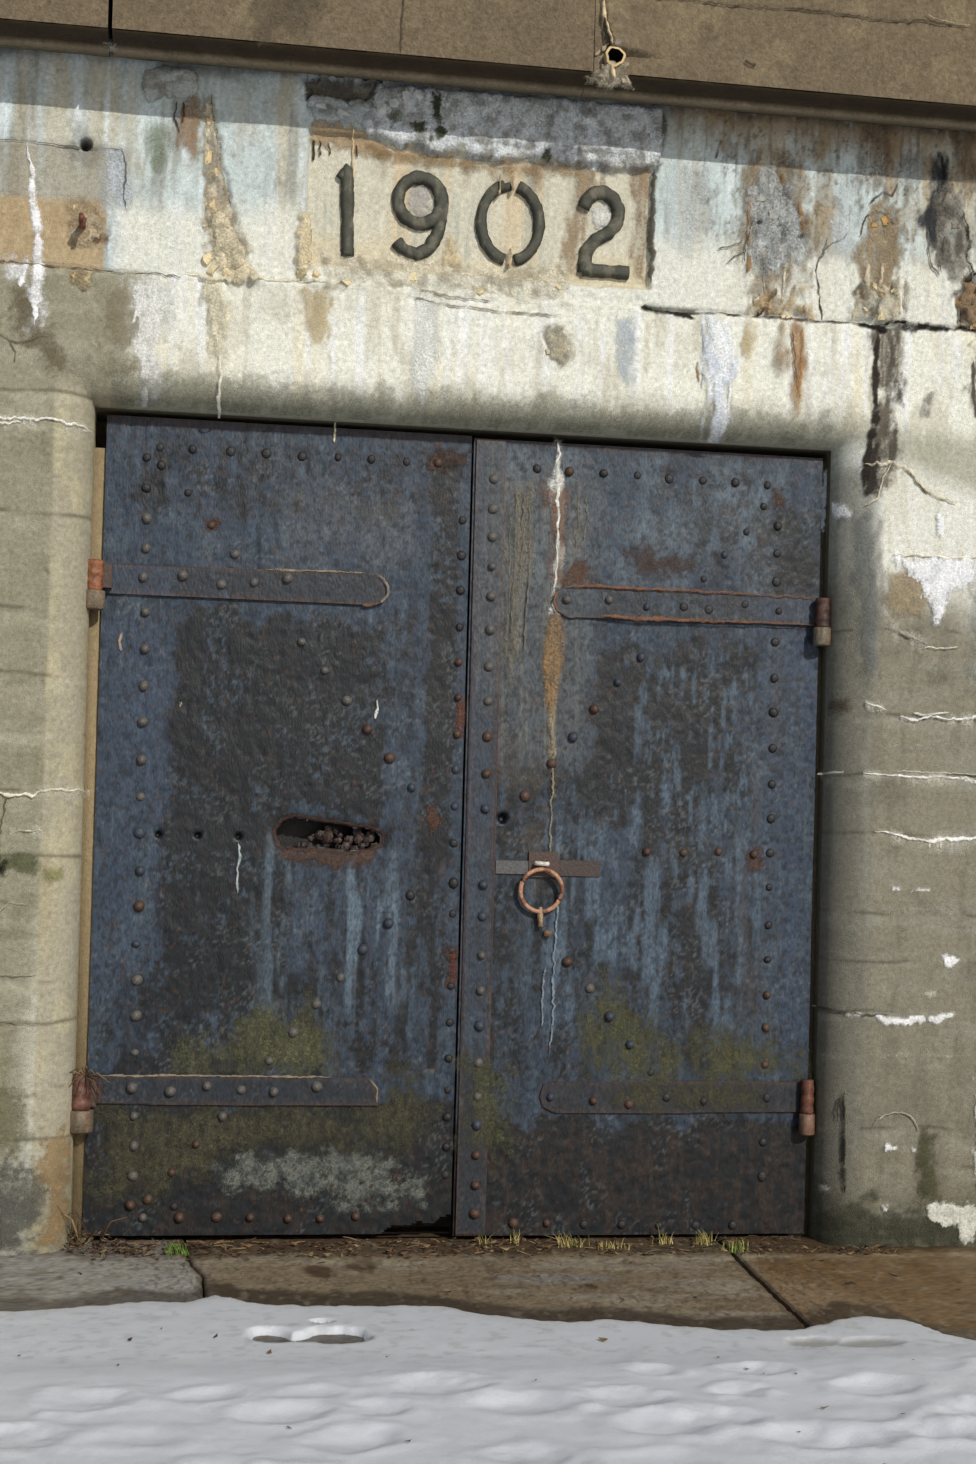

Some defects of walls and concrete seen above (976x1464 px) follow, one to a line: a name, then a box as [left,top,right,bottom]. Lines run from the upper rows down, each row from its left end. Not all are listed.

peeling [305,77,663,173]
leakage [918,153,952,276]
leakage [6,142,65,370]
crack [0,415,93,433]
leakage [821,328,976,674]
rust [553,545,813,612]
rust [602,614,814,625]
crack [865,702,976,724]
crack [818,770,976,783]
rust [293,825,377,851]
crack [875,831,976,848]